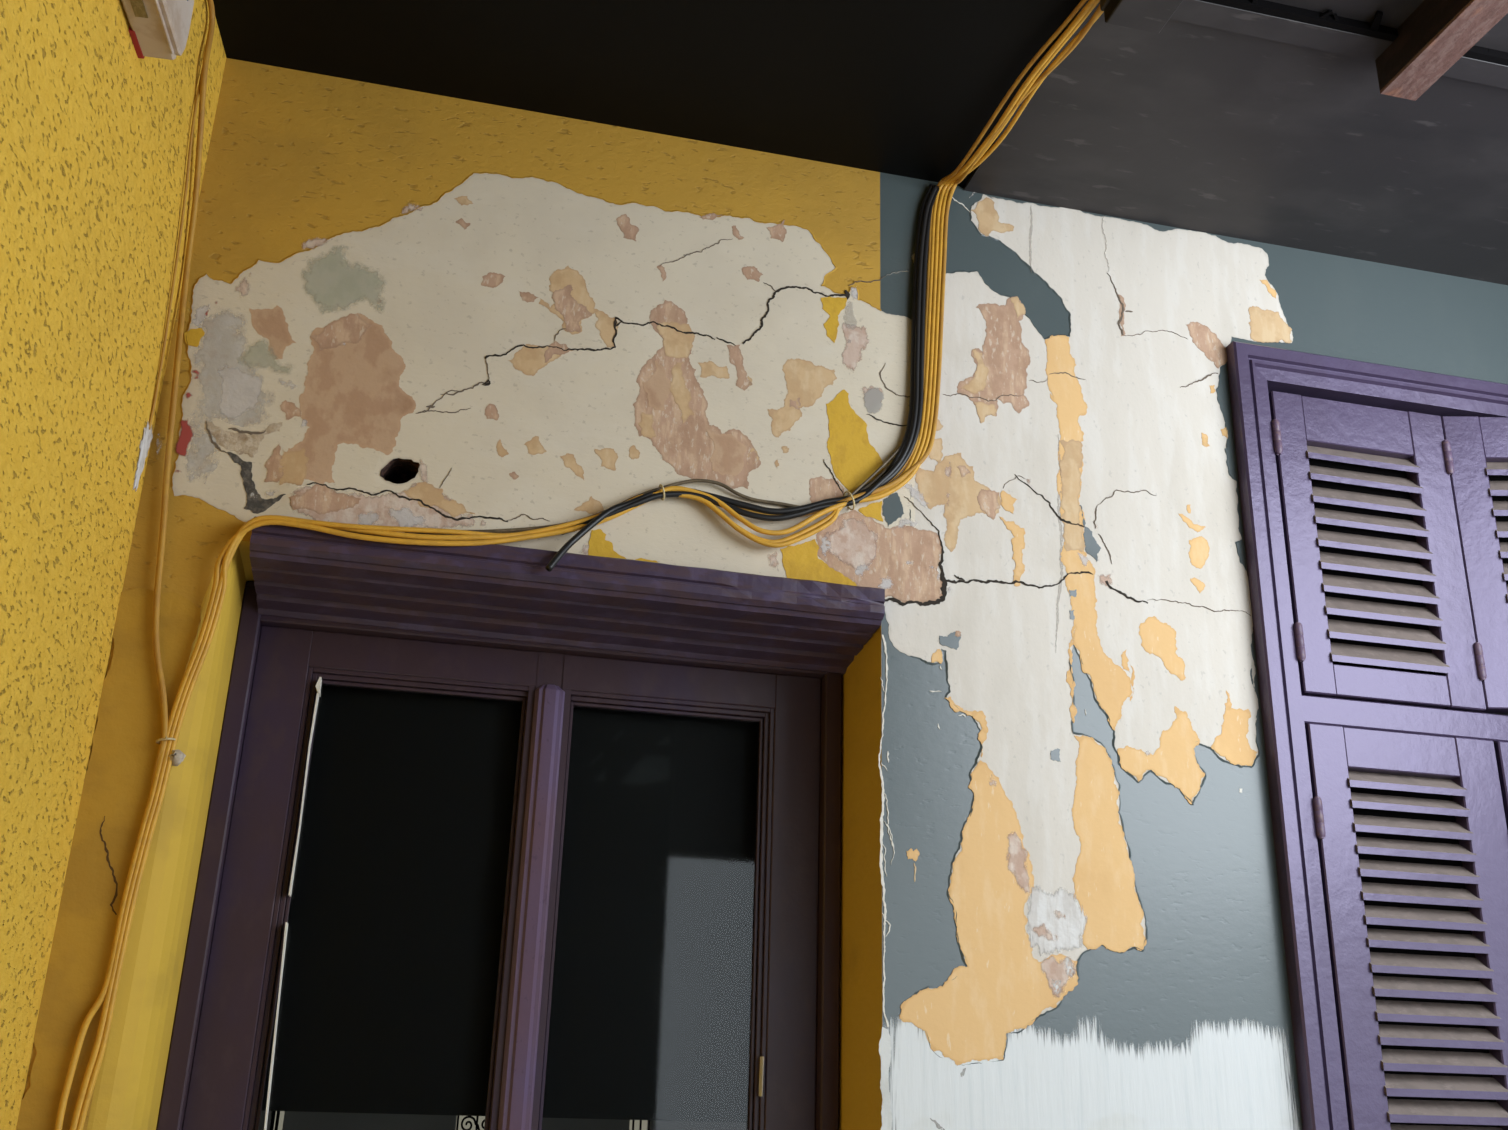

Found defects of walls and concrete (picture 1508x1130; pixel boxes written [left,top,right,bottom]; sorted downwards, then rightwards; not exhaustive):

crack [416,276,886,414]
crack [867,363,1086,426]
crack [1107,273,1187,339]
crack [206,421,548,522]
crack [885,474,1251,616]
peeling [171,172,1293,1065]